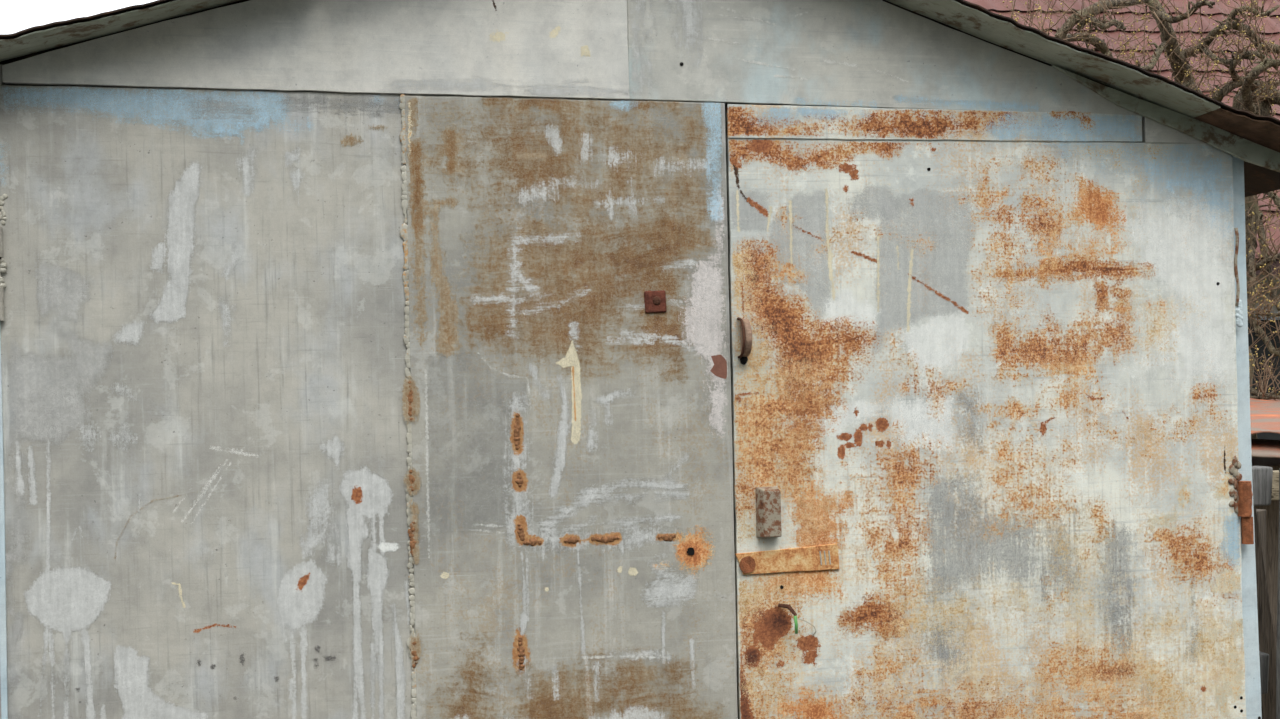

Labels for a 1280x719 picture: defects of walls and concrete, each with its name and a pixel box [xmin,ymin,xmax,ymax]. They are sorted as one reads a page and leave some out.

rust [338,124,389,148]
rust [401,97,1243,719]